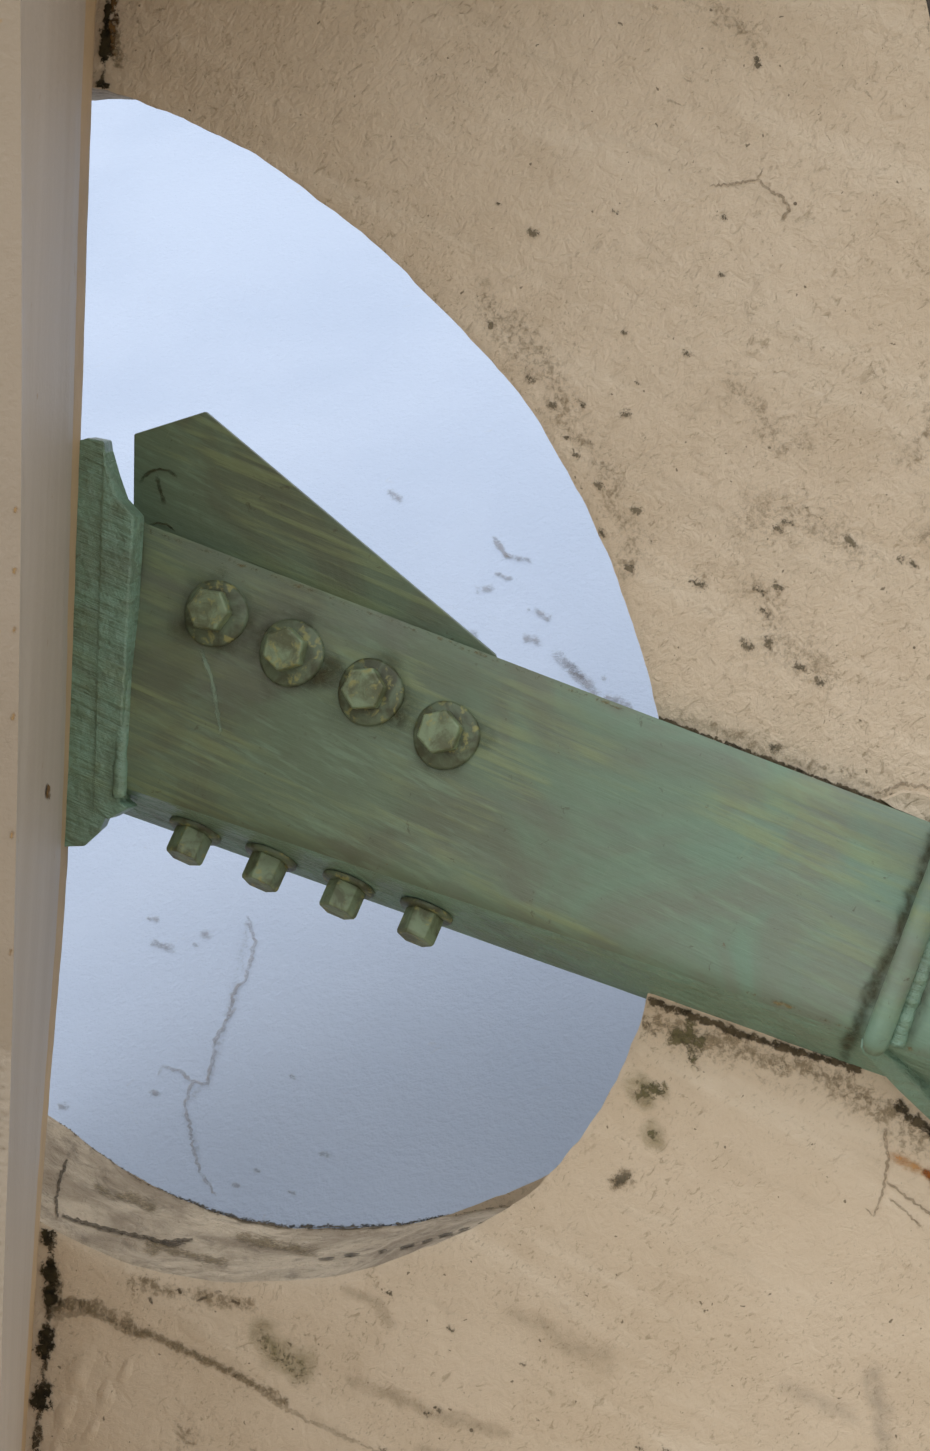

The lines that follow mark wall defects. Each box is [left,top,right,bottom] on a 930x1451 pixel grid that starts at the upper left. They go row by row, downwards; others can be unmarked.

damp [95,0,122,89]
crack [717,171,791,219]
rust [896,1156,930,1179]
damp [29,1228,90,1448]